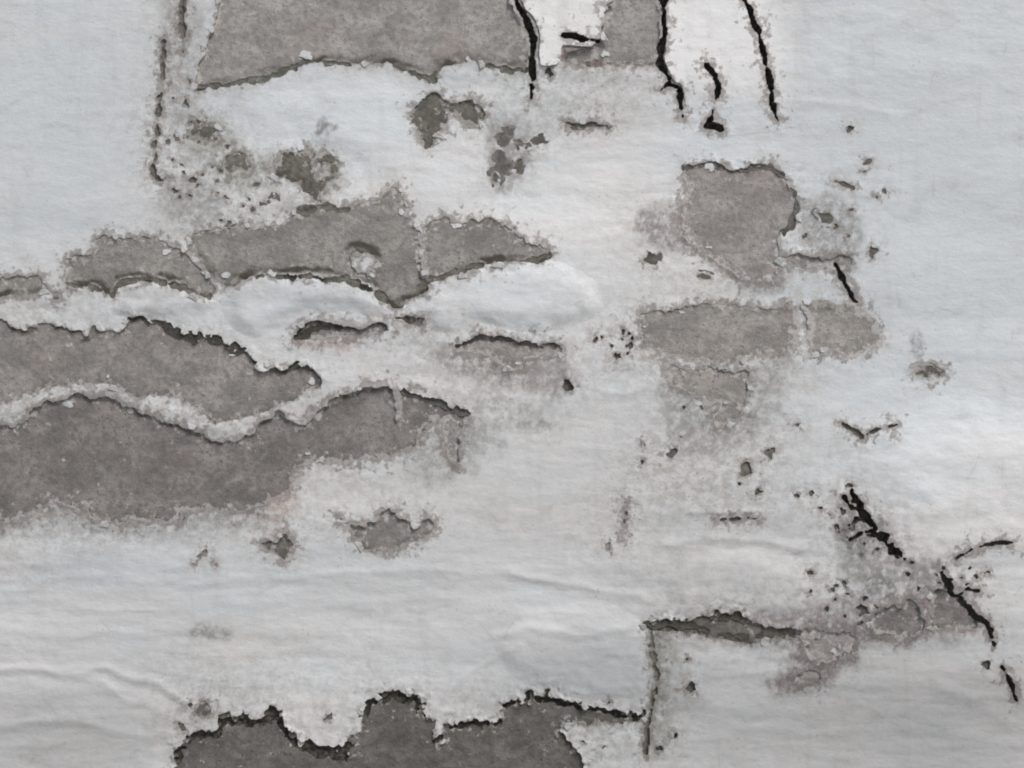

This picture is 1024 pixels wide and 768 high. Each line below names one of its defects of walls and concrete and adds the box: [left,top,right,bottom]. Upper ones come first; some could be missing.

peeling [172,0,809,148]
crack [514,0,600,99]
crack [655,0,724,132]
crack [742,0,779,121]
peeling [0,119,553,340]
peeling [681,161,852,284]
crack [833,262,858,303]
peeling [0,316,471,528]
crack [841,488,906,561]
peeling [639,566,978,684]
crack [940,540,1018,702]
peeling [173,688,648,768]